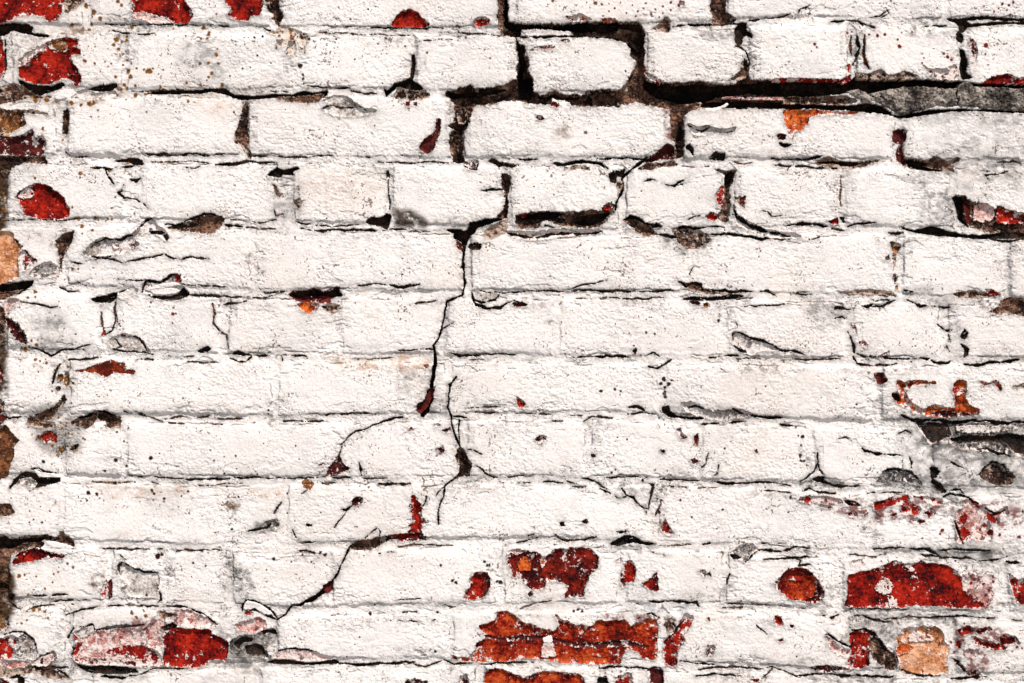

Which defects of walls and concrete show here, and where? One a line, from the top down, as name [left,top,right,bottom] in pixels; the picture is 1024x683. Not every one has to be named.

peeling [0,0,118,180]
peeling [419,0,1024,250]
crack [65,152,333,208]
crack [22,254,285,309]
crack [96,157,964,622]
crack [12,593,159,623]
peeling [0,531,415,683]
peeling [506,547,599,598]
peeling [822,559,994,619]
crack [849,547,1020,564]
crack [850,607,1021,623]
peeling [452,611,694,683]